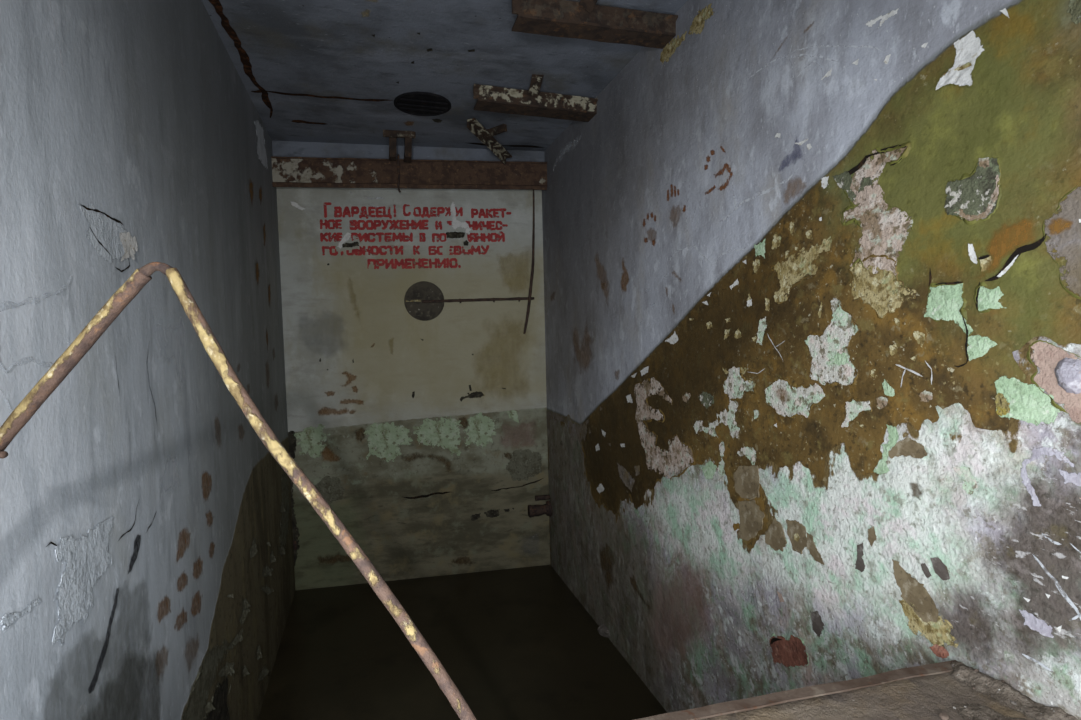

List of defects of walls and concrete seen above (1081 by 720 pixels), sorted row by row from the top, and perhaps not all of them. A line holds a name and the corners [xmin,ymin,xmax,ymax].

crack [208,0,393,125]
peeling [660,3,713,64]
peeling [936,31,985,90]
spalling [78,203,138,264]
peeling [288,424,331,459]
peeling [506,141,1081,720]
peeling [52,516,113,647]
rust [177,529,191,561]
rust [158,543,215,630]
rust [202,473,212,498]
peeling [279,472,300,566]
peeling [182,608,269,720]